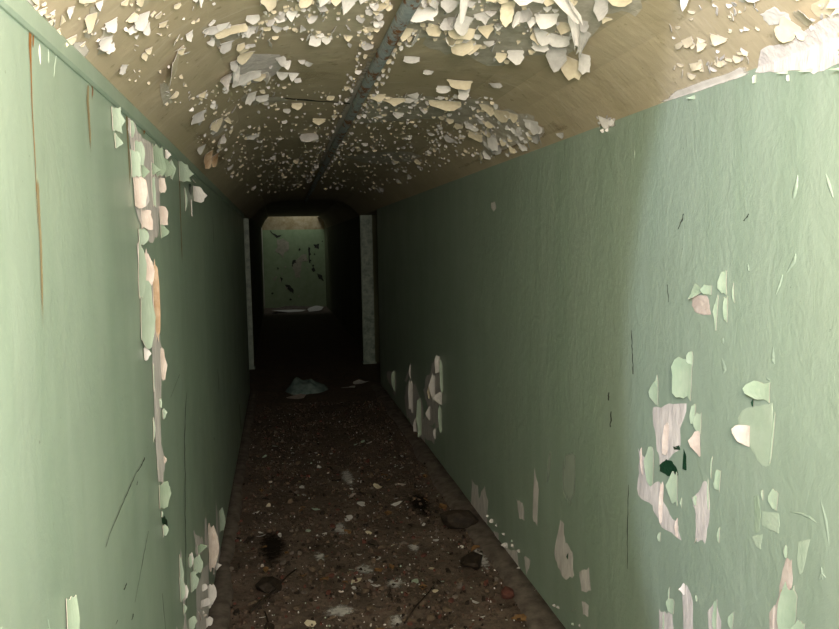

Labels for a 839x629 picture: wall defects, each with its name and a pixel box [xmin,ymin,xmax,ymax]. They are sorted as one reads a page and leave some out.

flaking render [664,0,839,102]
peeling [27,0,642,194]
peeling [111,107,207,537]
peeling [688,270,734,330]
flaking render [387,355,443,444]
peeling [637,351,701,541]
peeling [731,381,775,467]
crack [106,457,145,546]
peeling [692,456,721,543]
flaking render [176,505,226,629]
peeling [659,583,698,629]
peeling [769,539,810,629]